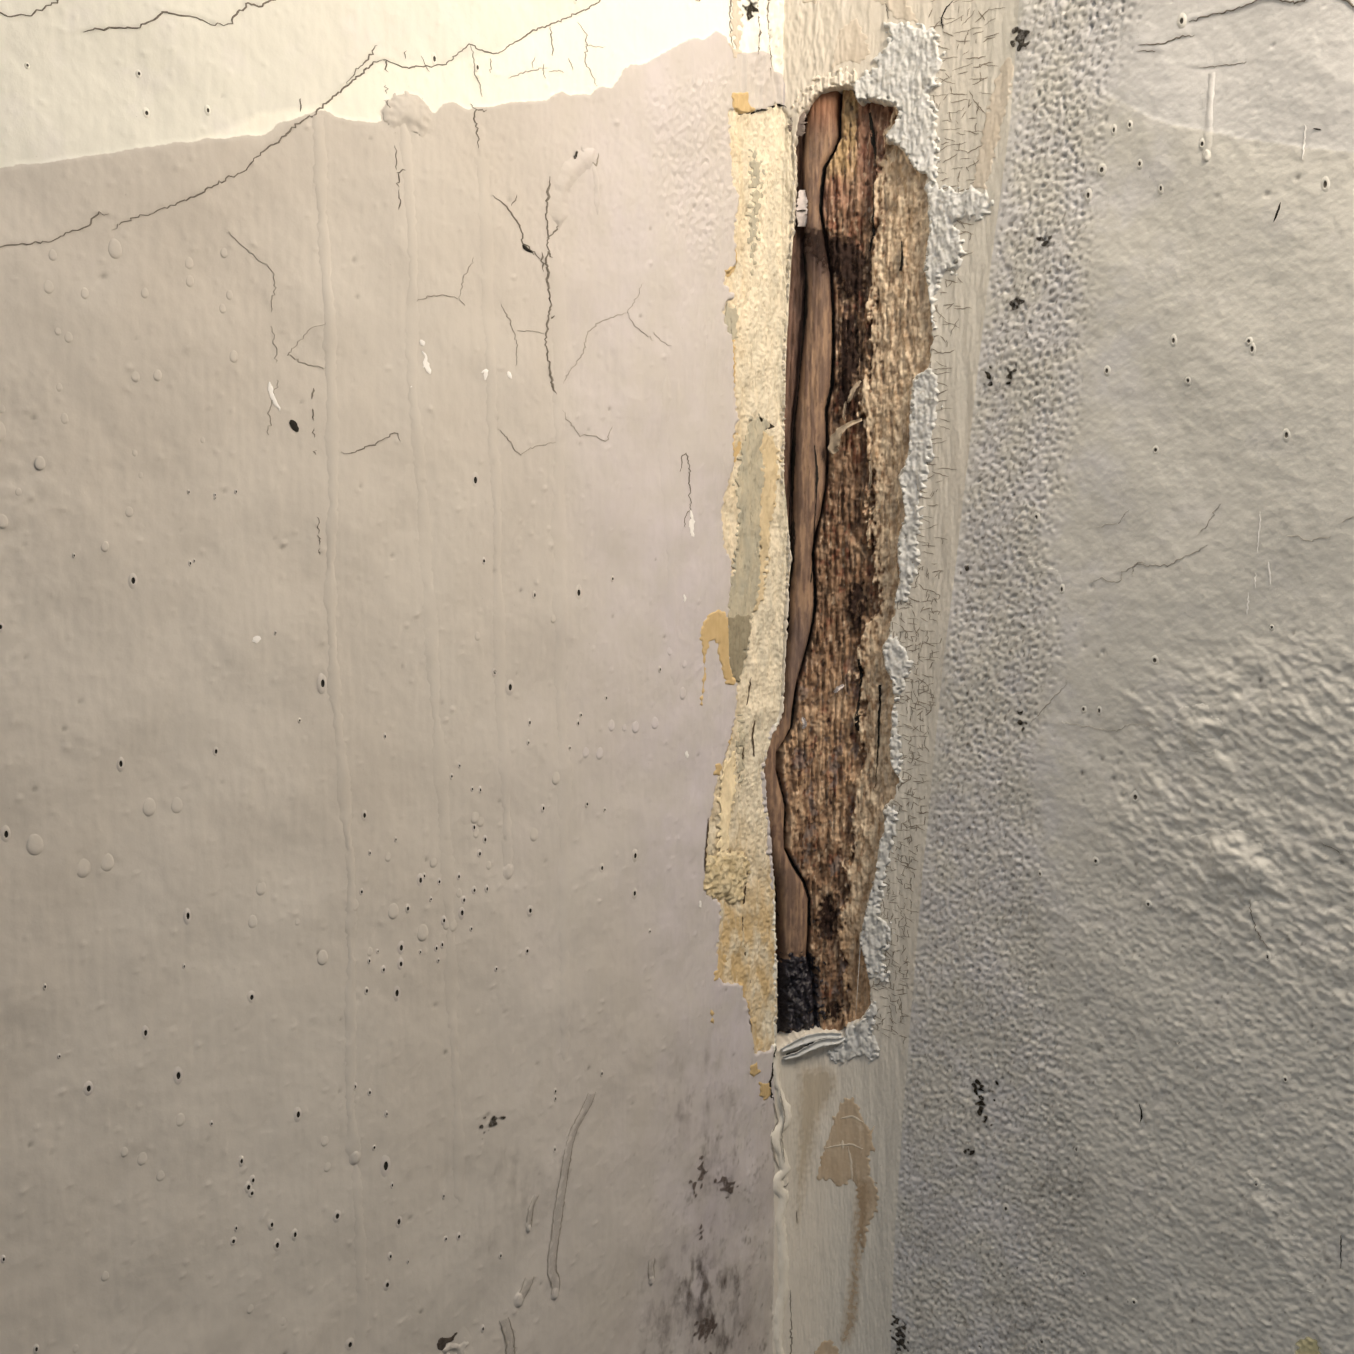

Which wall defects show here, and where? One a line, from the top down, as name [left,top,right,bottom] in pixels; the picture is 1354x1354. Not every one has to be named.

crack [0,0,603,247]
crack [695,0,772,70]
crack [1141,0,1306,68]
crack [229,232,400,454]
crack [417,257,474,305]
crack [493,179,671,455]
crack [680,453,692,527]
spalling [699,0,1014,1100]
crack [861,0,1005,1044]